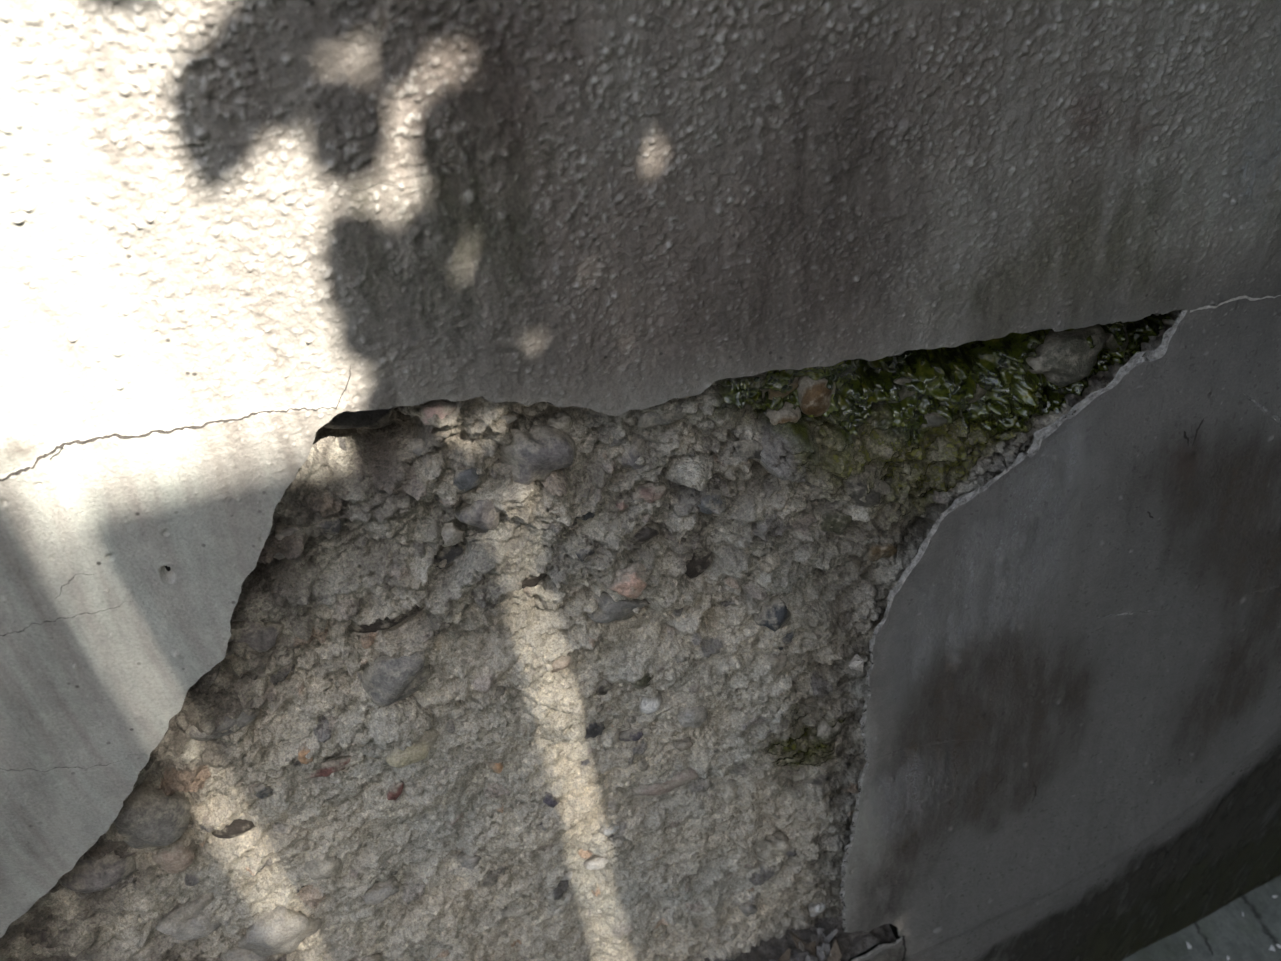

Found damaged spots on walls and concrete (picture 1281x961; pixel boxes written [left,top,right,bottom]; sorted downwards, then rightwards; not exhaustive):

crack [0,365,351,481]
spalling [0,309,1188,961]